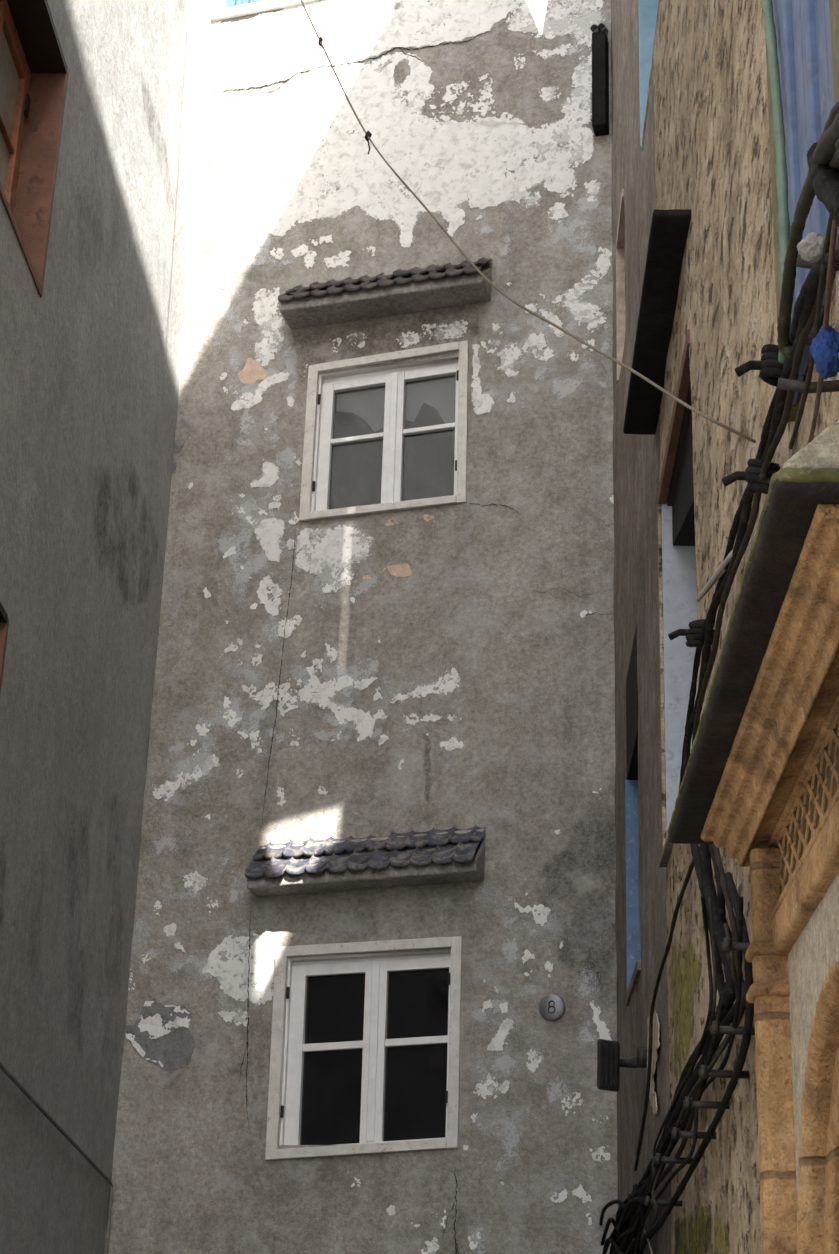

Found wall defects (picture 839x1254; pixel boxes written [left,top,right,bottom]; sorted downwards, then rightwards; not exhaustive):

crack [205,24,501,96]
peeling [196,0,605,269]
peeling [220,287,308,411]
peeling [223,459,412,638]
peeling [153,696,263,801]
crack [261,525,296,827]
peeling [242,643,464,751]
flaking render [125,998,195,1073]
peeling [202,930,277,1027]
crack [240,910,251,1123]
peeling [482,980,514,1051]
crack [442,1165,459,1254]